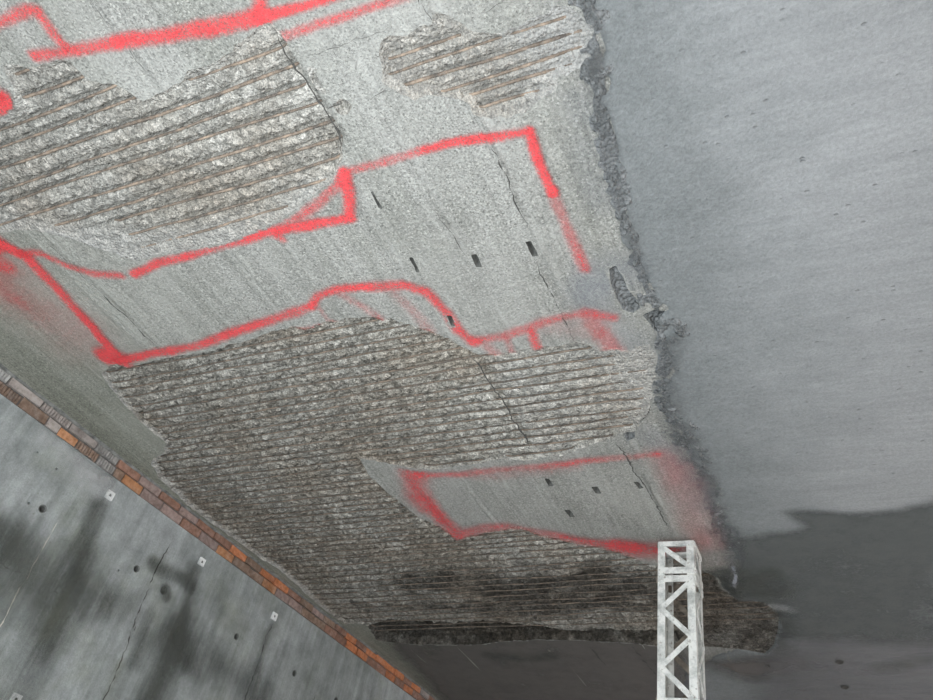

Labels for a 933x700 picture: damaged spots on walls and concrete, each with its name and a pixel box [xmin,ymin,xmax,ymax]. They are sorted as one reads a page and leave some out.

spalling [379,6,599,119]
spalling [0,22,352,261]
spalling [609,266,665,331]
spalling [102,317,658,646]
crack [616,444,667,526]
spalling [673,564,688,647]
spalling [701,571,779,653]
water stain [711,505,933,700]